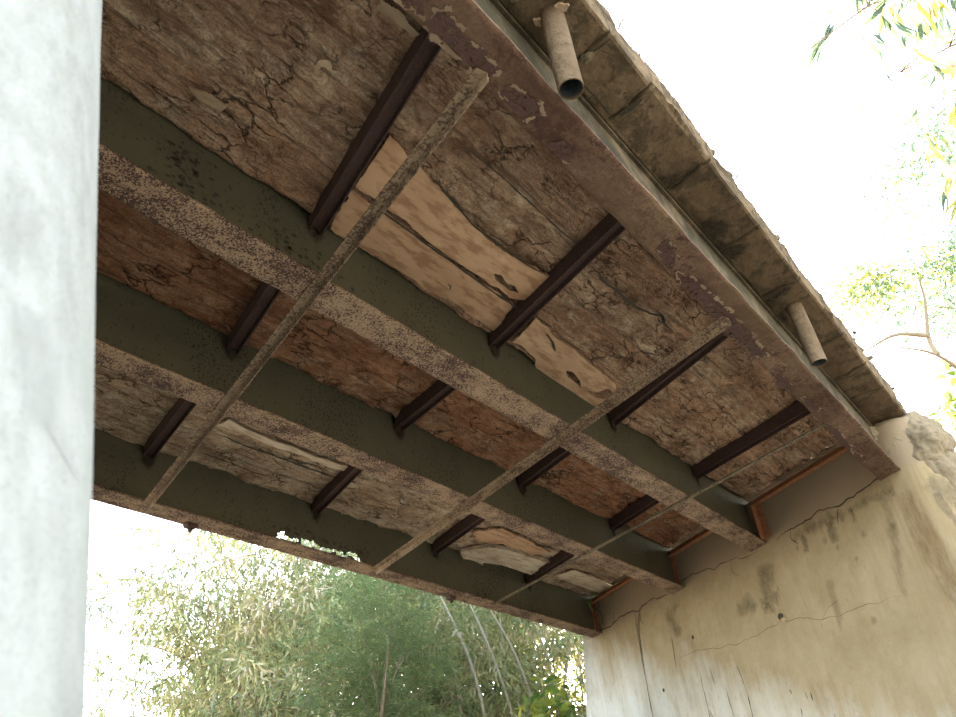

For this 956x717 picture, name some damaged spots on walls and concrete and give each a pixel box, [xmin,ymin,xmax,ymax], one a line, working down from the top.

rust [393,0,547,123]
peeling [330,135,409,238]
peeling [359,167,550,331]
rust [657,240,770,360]
peeling [512,317,616,407]
peeling [217,418,348,471]
crack [776,478,878,544]
peeling [460,544,550,575]
peeling [555,570,613,593]
crack [587,553,754,716]
crack [671,596,898,670]